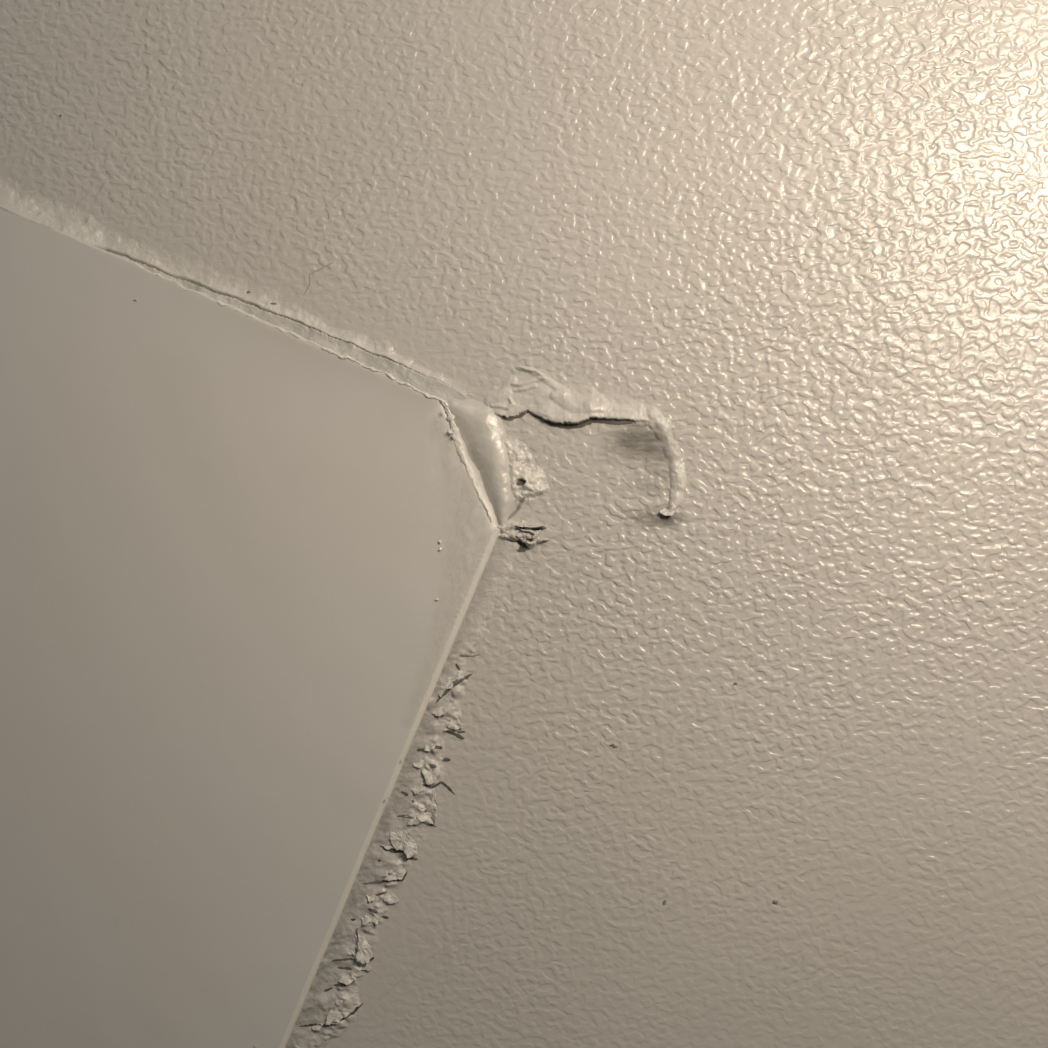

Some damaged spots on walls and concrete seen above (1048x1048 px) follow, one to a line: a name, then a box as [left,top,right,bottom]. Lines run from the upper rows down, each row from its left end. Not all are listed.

peeling [481,366,687,516]
peeling [504,520,537,552]
peeling [441,715,465,740]
peeling [299,742,455,1031]